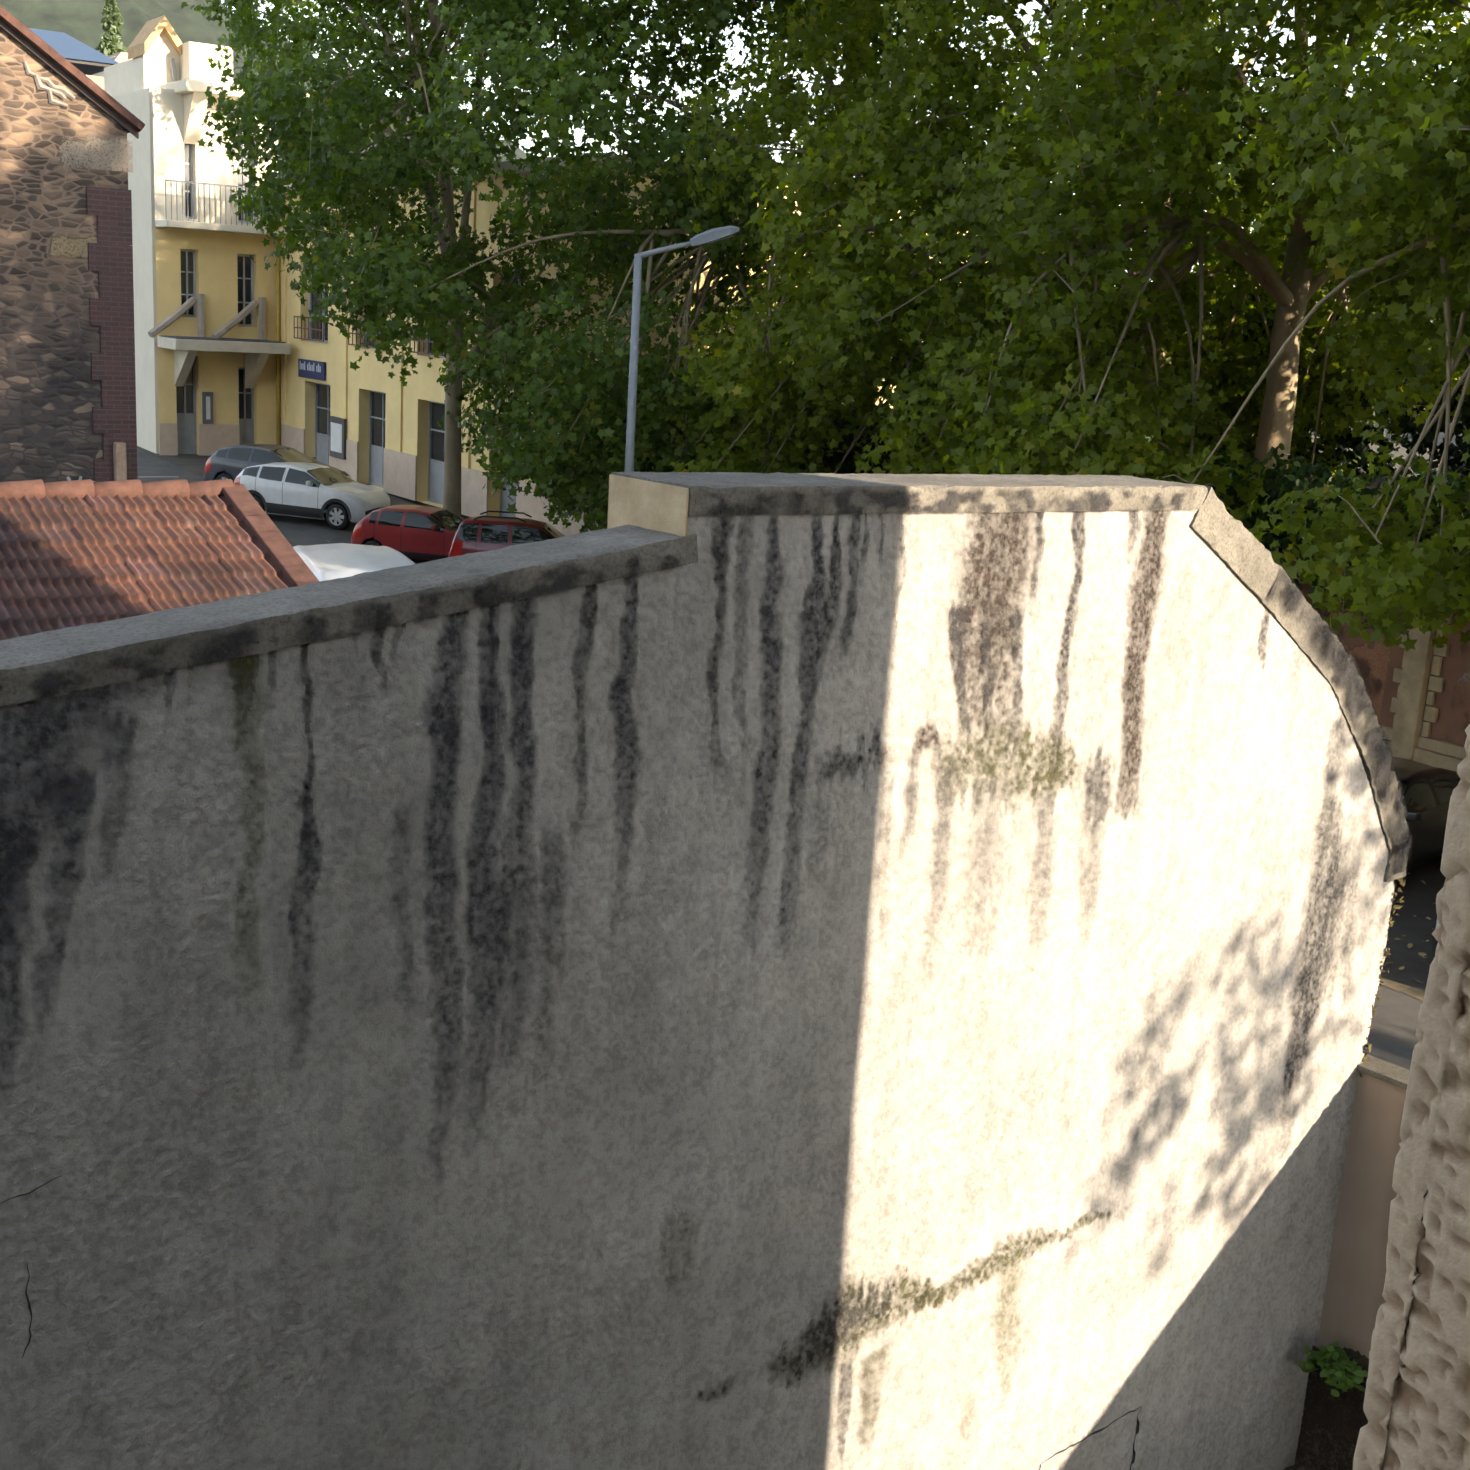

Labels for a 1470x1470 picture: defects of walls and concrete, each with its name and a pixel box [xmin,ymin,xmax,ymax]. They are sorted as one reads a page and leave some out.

water stain [753,509,903,863]
water stain [950,608,995,722]
water stain [1012,612,1023,711]
water stain [1053,511,1085,772]
water stain [1090,510,1167,857]
water stain [0,680,144,1050]
water stain [427,597,563,1038]
water stain [1288,816,1351,1088]
crack [22,1264,32,1358]
crack [0,1175,62,1204]
water stain [917,1213,1105,1323]
water stain [1294,1345,1368,1470]